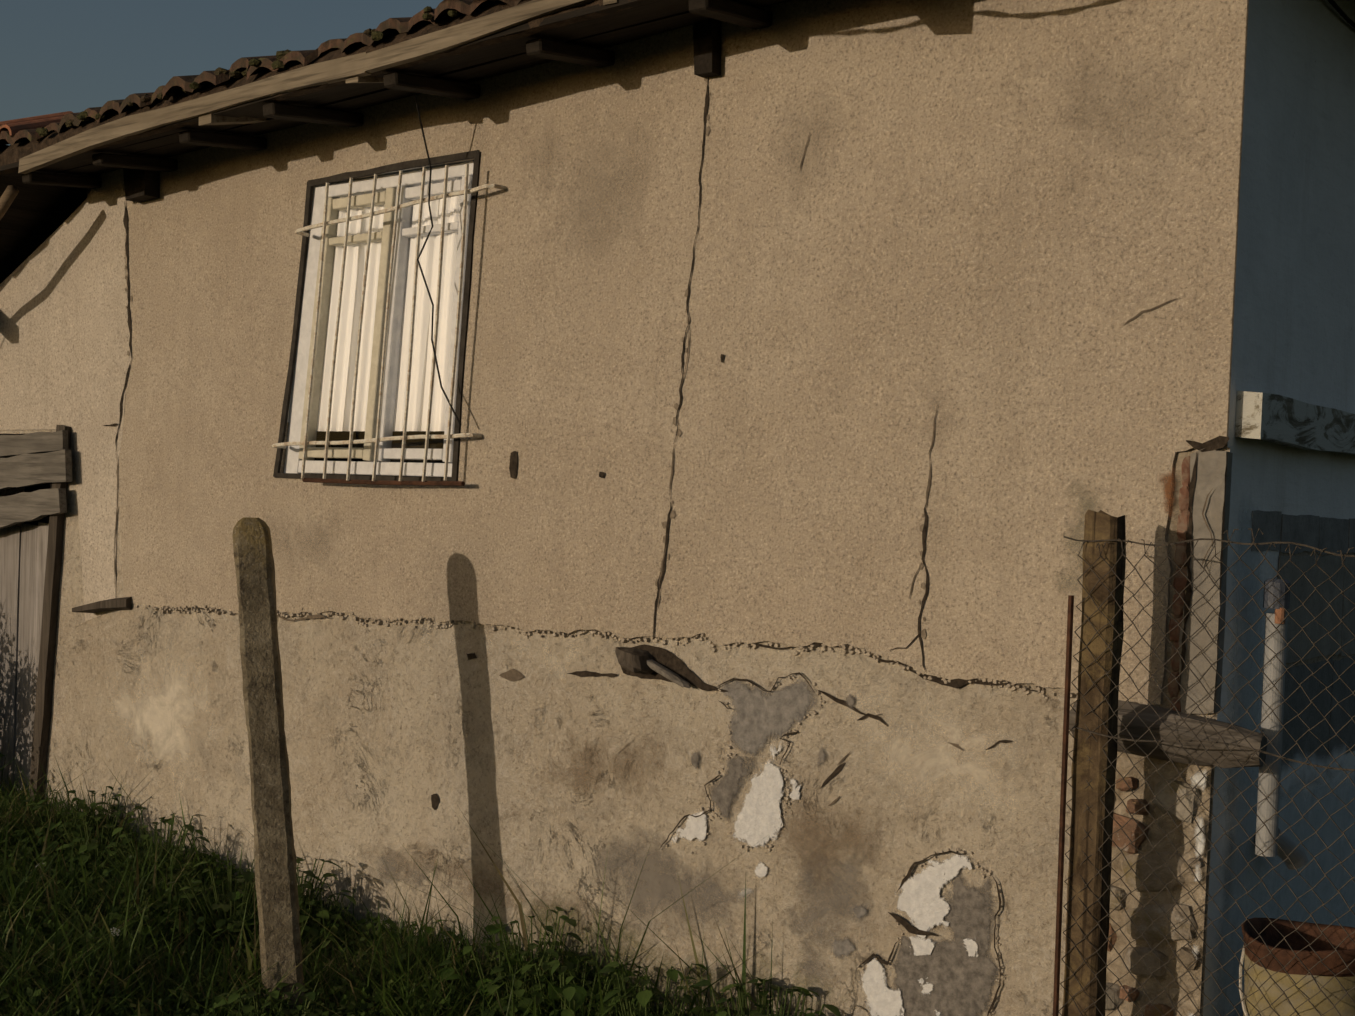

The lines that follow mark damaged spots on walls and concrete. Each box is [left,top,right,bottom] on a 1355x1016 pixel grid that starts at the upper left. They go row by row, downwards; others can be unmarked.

crack [103,200,132,588]
crack [653,77,710,639]
crack [277,613,327,621]
crack [567,670,617,678]
crack [682,678,728,692]
spalling [659,672,876,895]
crack [748,404,1038,692]
flaking render [1159,452,1194,714]
spalling [831,848,1006,1016]